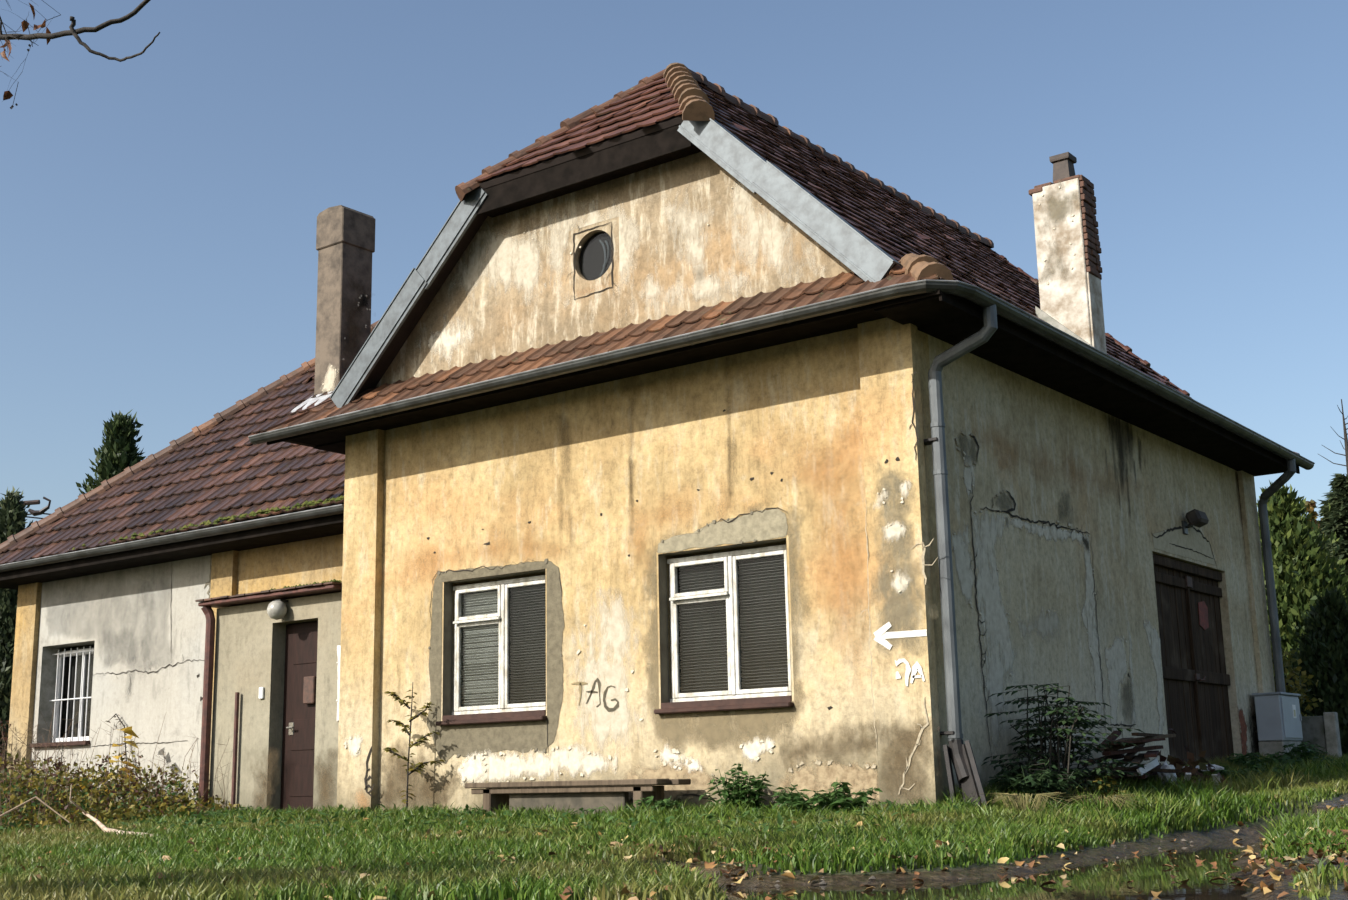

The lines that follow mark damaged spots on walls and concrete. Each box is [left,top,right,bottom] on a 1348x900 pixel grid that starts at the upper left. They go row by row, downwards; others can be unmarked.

water stain [1108,415,1141,483]
peeling [877,482,909,506]
peeling [890,570,908,593]
peeling [884,522,938,585]
peeling [952,490,1128,746]
crack [93,654,204,693]
peeling [456,590,717,803]
peeling [739,738,775,761]